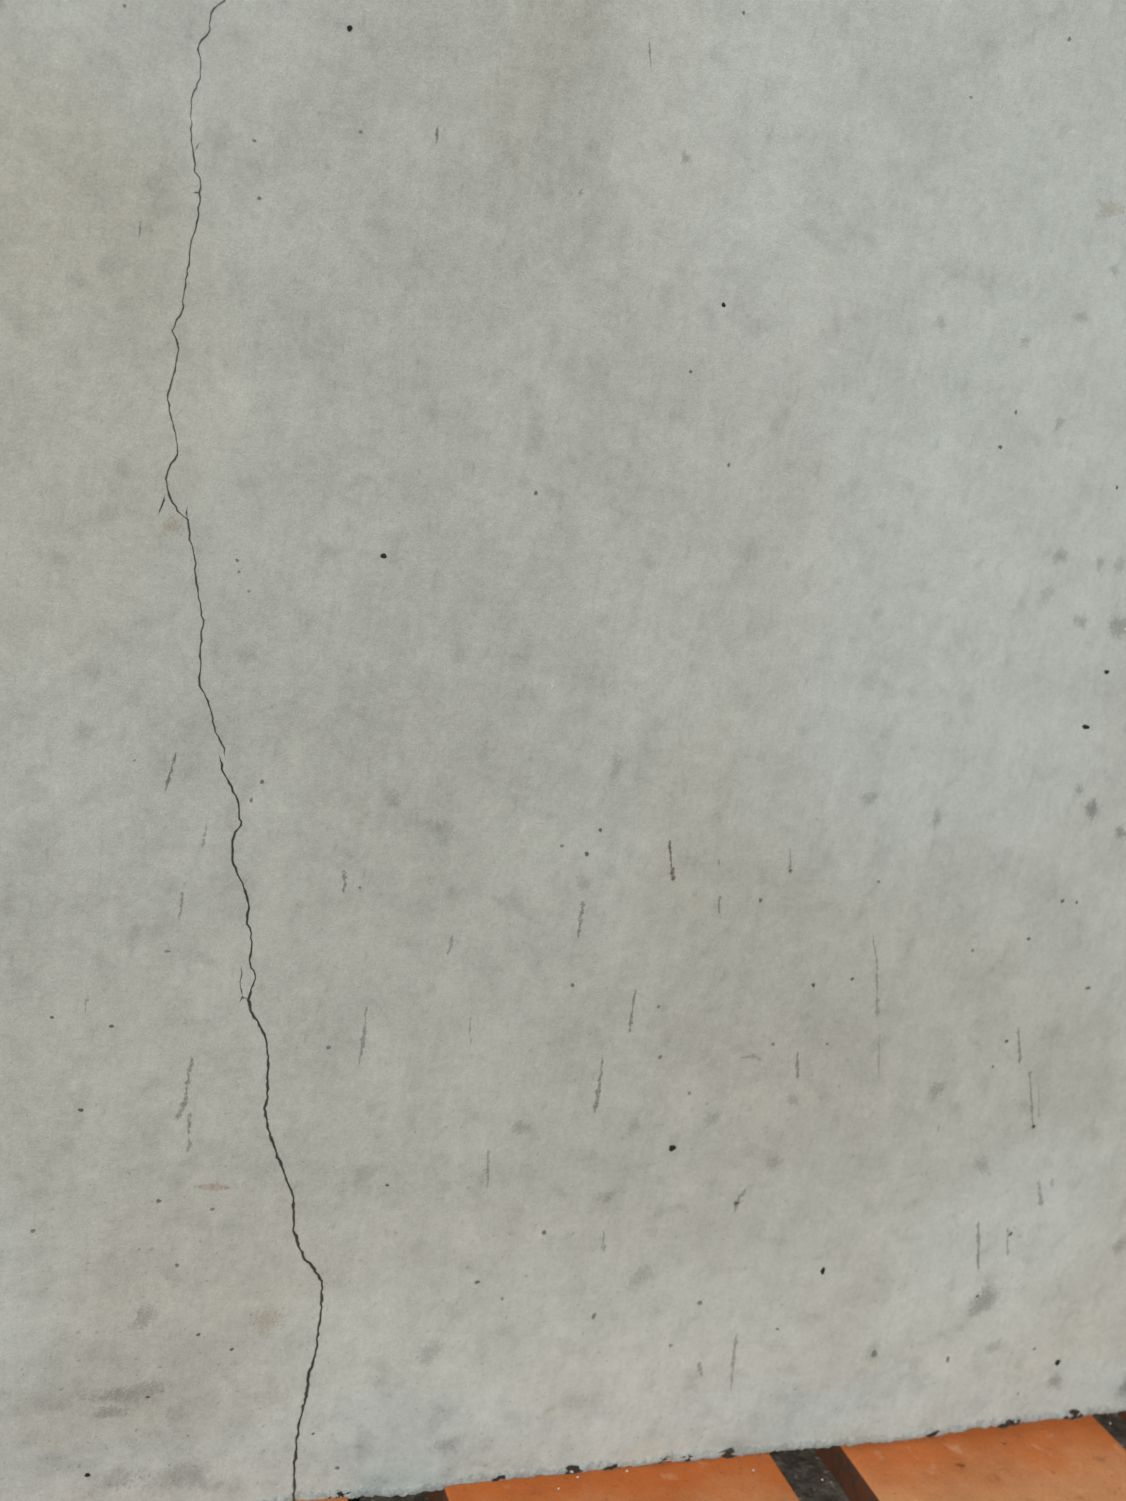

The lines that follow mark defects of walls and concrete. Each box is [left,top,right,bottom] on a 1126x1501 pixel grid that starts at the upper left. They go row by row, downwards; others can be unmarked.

crack [159,0,323,1501]